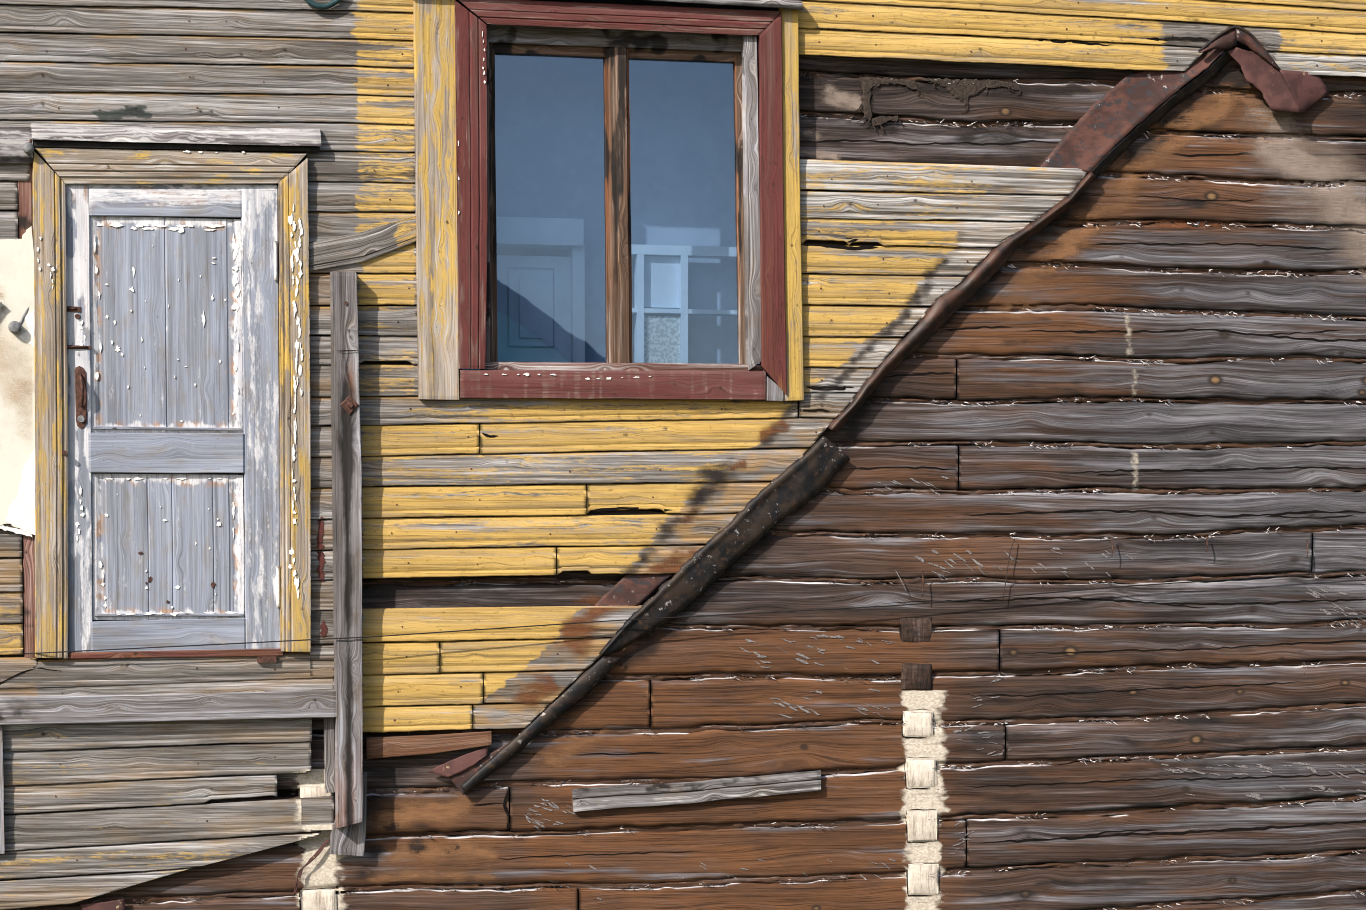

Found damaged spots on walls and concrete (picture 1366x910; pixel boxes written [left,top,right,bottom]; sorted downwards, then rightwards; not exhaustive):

rust [1128,219,1228,229]
peeling [94,222,240,371]
peeling [79,315,123,357]
peeling [288,205,303,525]
rust [759,421,788,438]
peeling [99,561,237,616]
peeling [288,547,300,599]
rust [651,550,697,584]
rust [562,597,612,654]
rust [517,676,558,705]